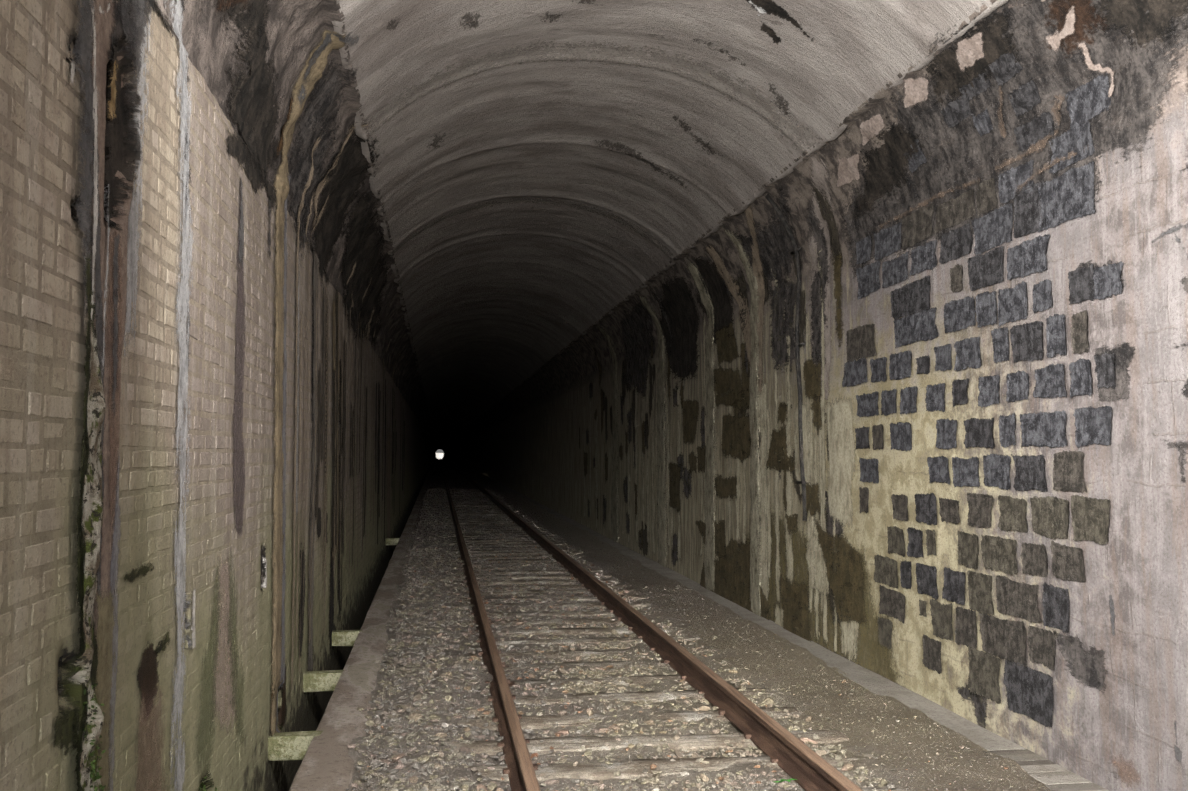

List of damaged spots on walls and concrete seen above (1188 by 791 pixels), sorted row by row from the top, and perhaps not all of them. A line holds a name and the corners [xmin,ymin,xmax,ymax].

leakage [124,14,153,356]
leakage [138,0,194,791]
leakage [233,178,246,536]
leakage [227,24,282,182]
leakage [278,40,859,726]
flaking render [579,0,1135,727]